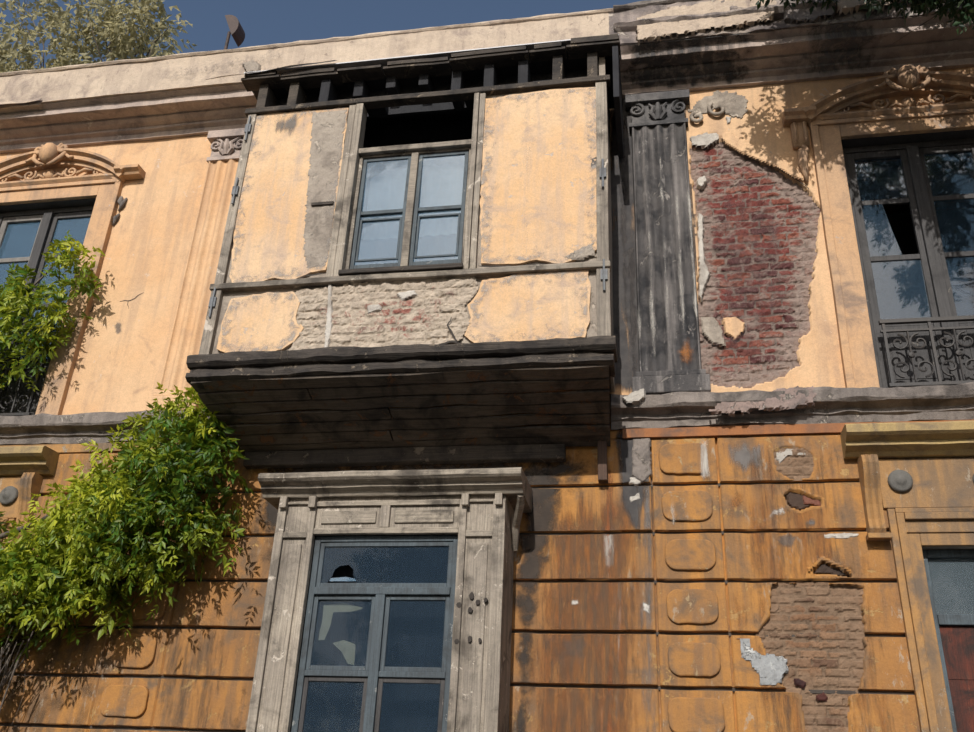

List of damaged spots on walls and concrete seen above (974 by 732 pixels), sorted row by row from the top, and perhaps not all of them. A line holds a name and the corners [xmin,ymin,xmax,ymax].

damp [623,33,749,88]
flaking render [636,0,835,46]
damp [805,22,876,73]
flaking render [267,110,349,277]
flaking render [687,90,821,388]
flaking render [222,272,566,352]
flaking render [629,438,653,502]
flaking render [773,447,821,511]
damp [515,468,560,732]
flaking render [737,556,865,732]